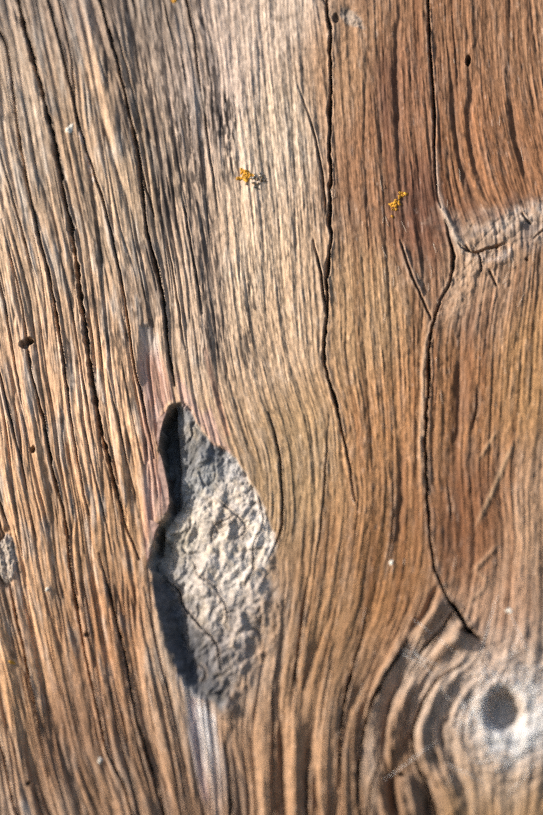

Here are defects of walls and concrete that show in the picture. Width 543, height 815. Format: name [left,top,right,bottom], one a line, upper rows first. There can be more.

crack [0,0,155,815]
crack [98,554,167,815]
crack [98,0,176,386]
crack [162,413,284,684]
crack [297,0,356,501]
crack [336,0,504,815]